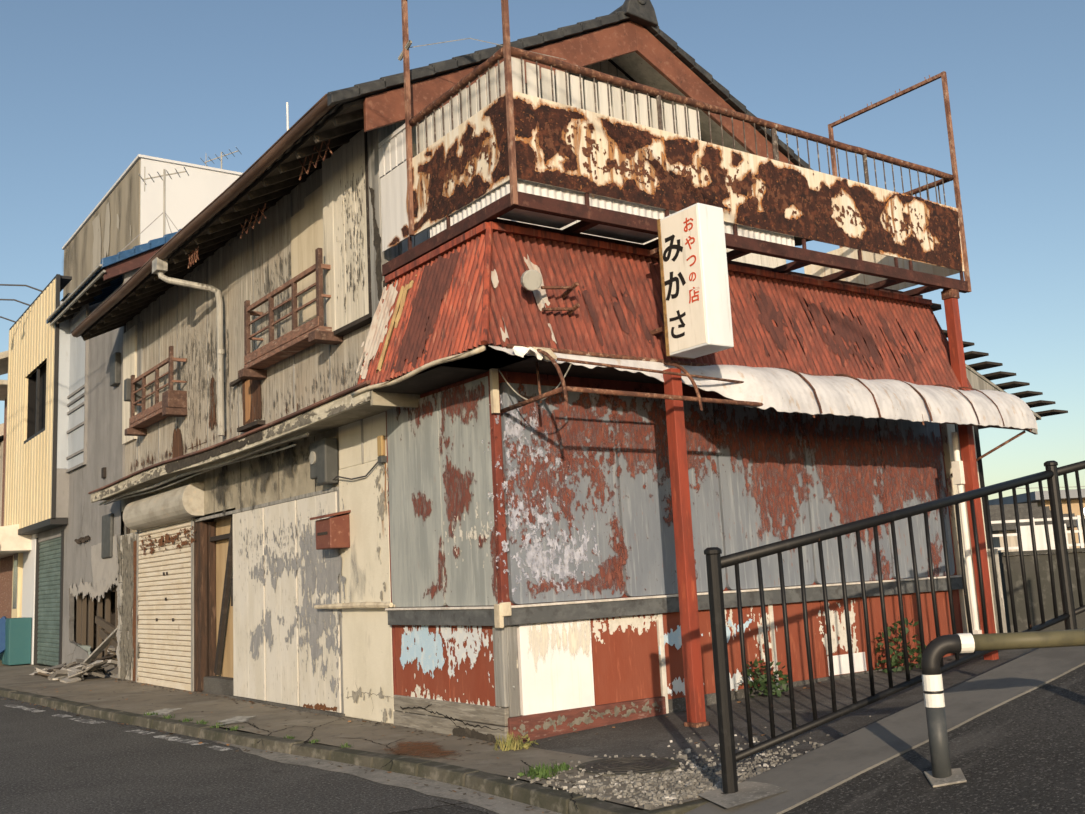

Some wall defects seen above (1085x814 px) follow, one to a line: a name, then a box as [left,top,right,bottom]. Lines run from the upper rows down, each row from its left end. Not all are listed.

corrosion [388,95,962,271]
peeling [262,173,417,438]
corrosion [390,249,460,373]
corrosion [578,270,655,348]
peeling [396,374,673,602]
corrosion [132,526,196,681]
peeling [249,523,392,723]
crack [245,689,504,745]
peeling [400,625,501,708]
peeling [592,614,658,644]
peeling [725,606,777,692]
peeling [818,600,858,655]